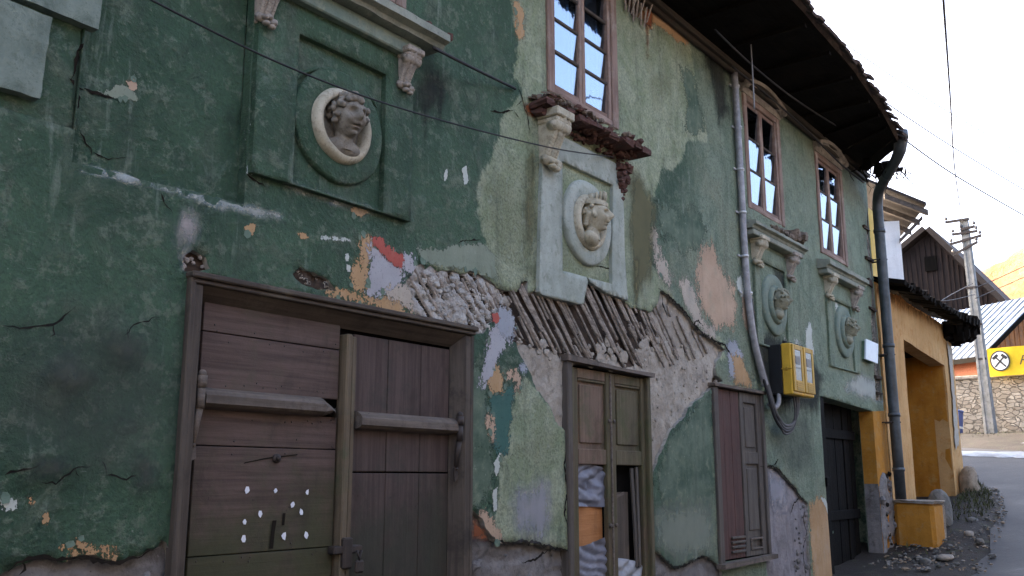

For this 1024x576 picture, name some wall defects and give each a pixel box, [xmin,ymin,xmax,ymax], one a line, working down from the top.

crack [69,43,126,160]
peeling [97,75,138,103]
spalling [183,252,205,271]
crack [3,306,76,337]
spalling [293,196,755,576]
crack [5,461,136,485]
spalling [766,468,834,576]
spalling [0,535,165,576]